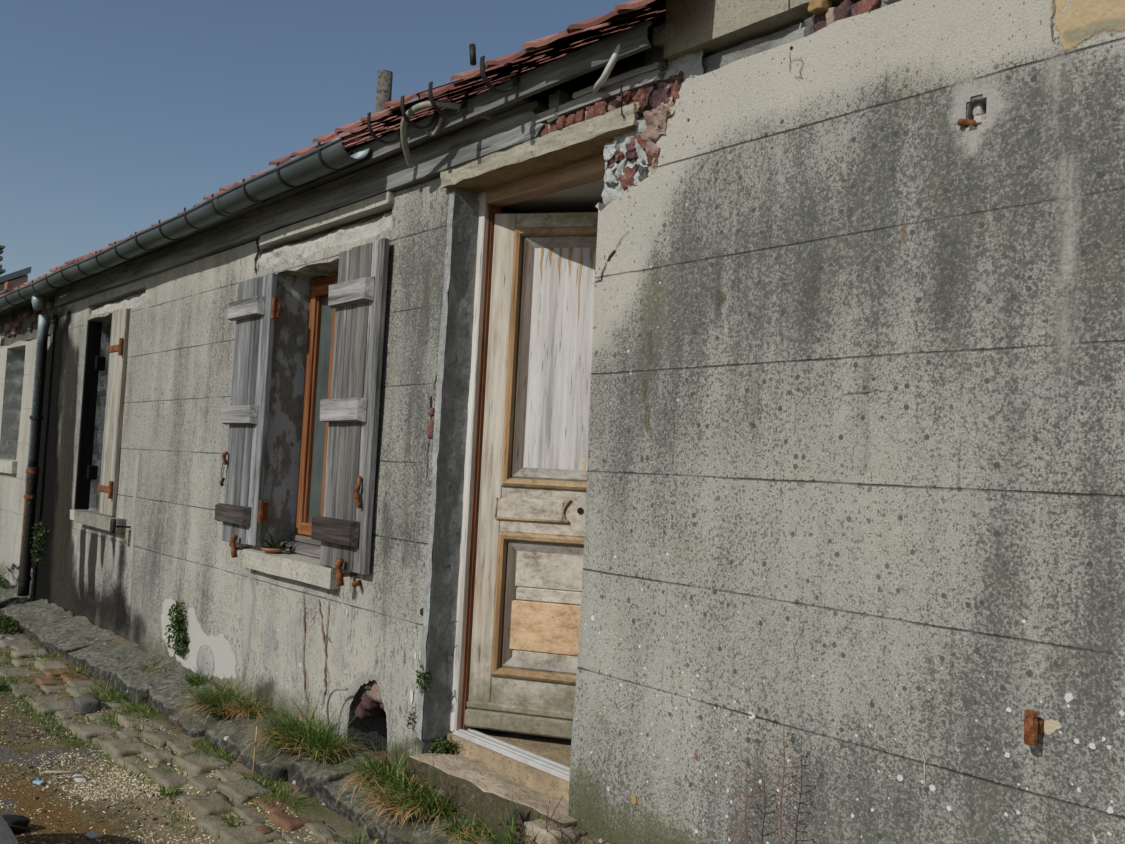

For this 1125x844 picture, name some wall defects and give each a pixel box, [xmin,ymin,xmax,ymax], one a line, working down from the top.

flaking render [532,0,901,207]
peeling [1050,0,1125,50]
leakage [1059,162,1077,357]
leakage [29,309,141,642]
peeling [160,576,255,680]
spalling [326,675,391,766]